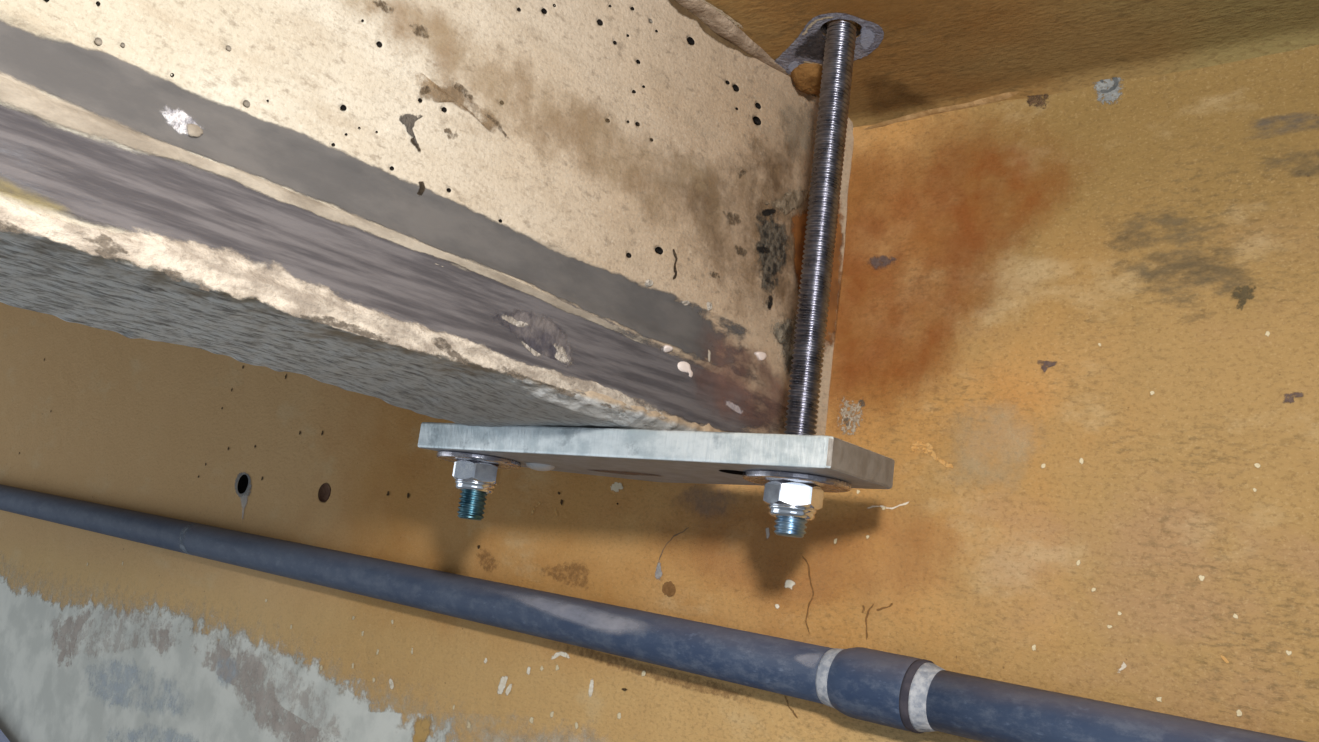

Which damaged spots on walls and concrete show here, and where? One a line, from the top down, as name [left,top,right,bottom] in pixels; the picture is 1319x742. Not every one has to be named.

leakage [756,209,788,310]
peeling [0,570,591,742]